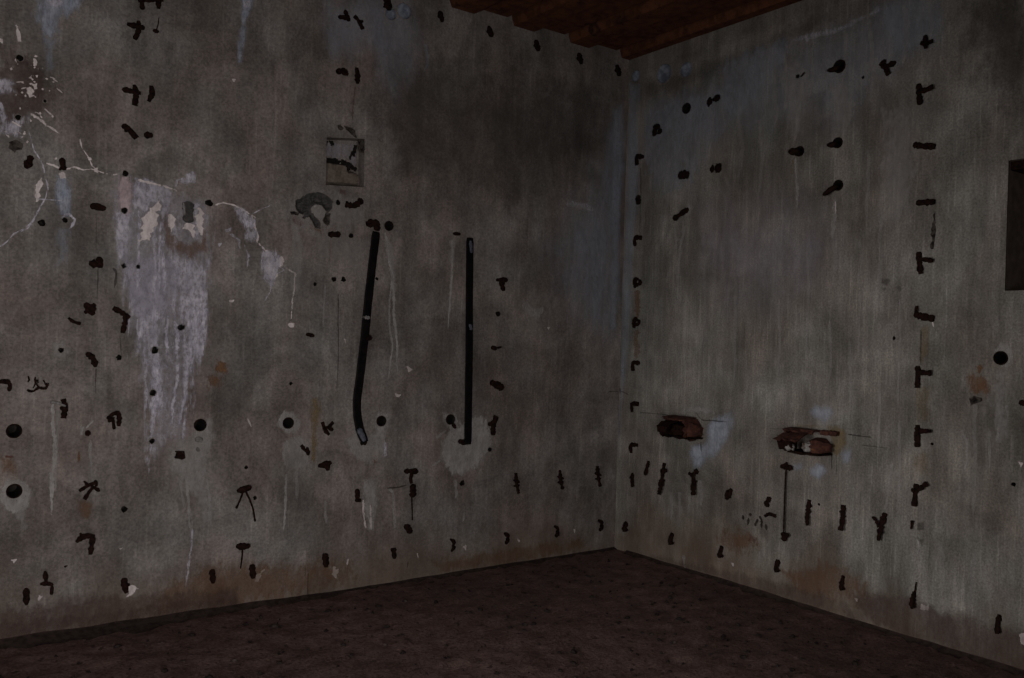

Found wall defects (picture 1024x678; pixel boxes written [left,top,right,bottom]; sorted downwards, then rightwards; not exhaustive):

crack [0,133,117,247]
crack [215,202,284,299]
leakage [116,171,210,449]